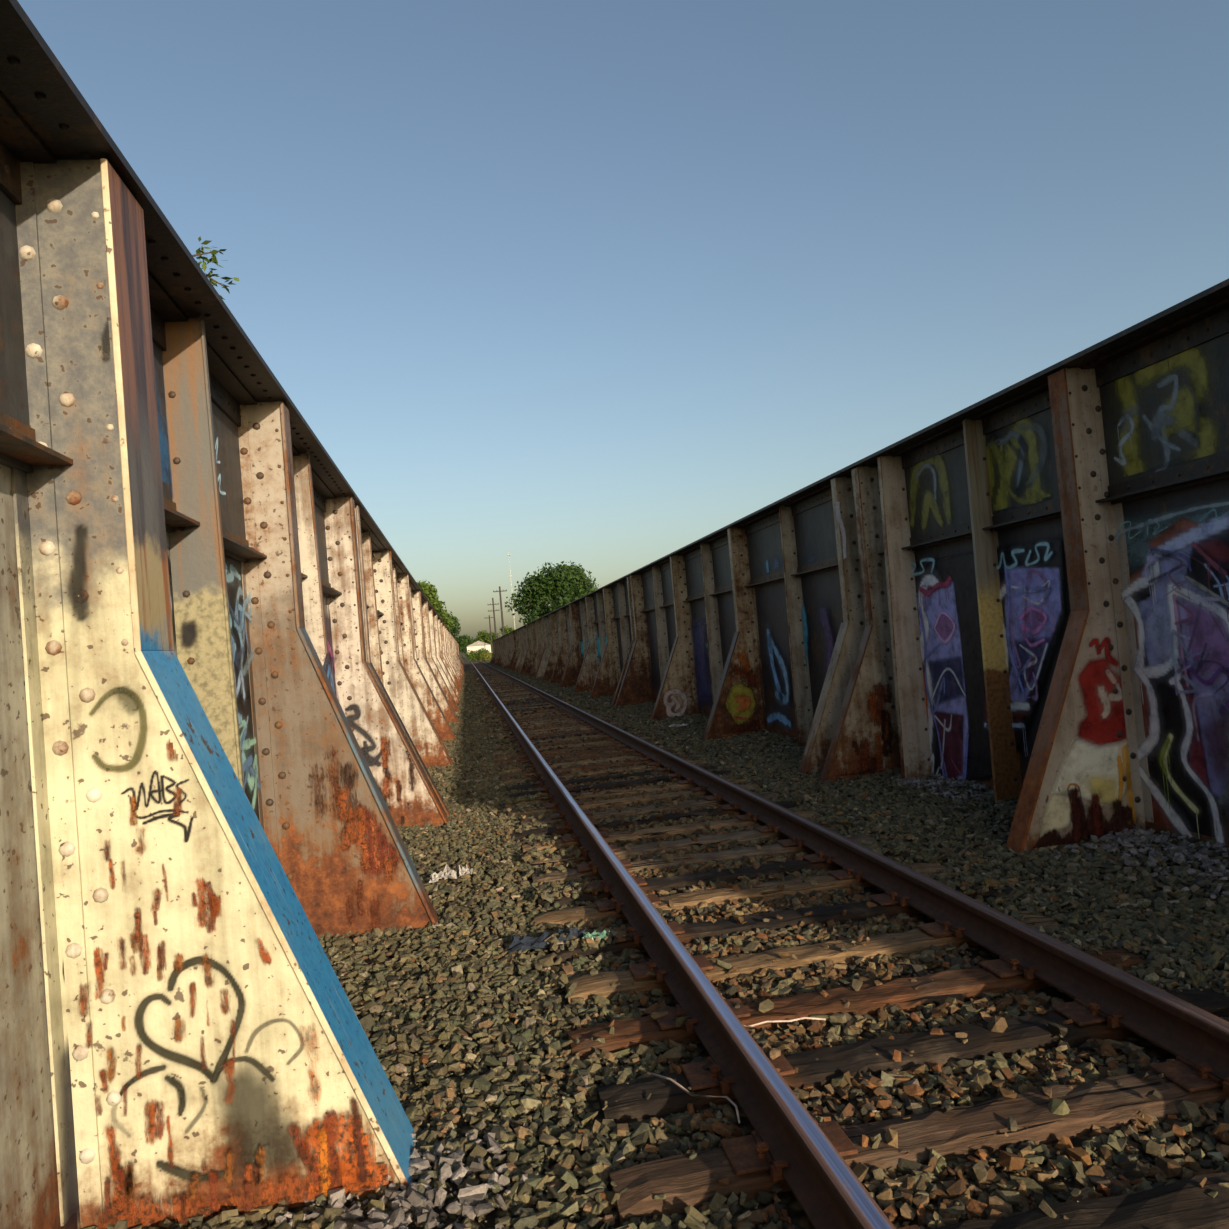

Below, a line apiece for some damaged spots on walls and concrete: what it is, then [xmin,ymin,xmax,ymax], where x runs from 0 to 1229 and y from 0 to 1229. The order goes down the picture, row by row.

rust [381,736,415,802]
rust [841,682,893,776]
rust [104,842,125,889]
rust [79,864,183,1048]
rust [192,878,221,932]
rust [258,939,272,965]
rust [310,750,401,931]
rust [174,954,235,1103]
rust [306,1029,321,1100]
rust [95,1045,389,1229]